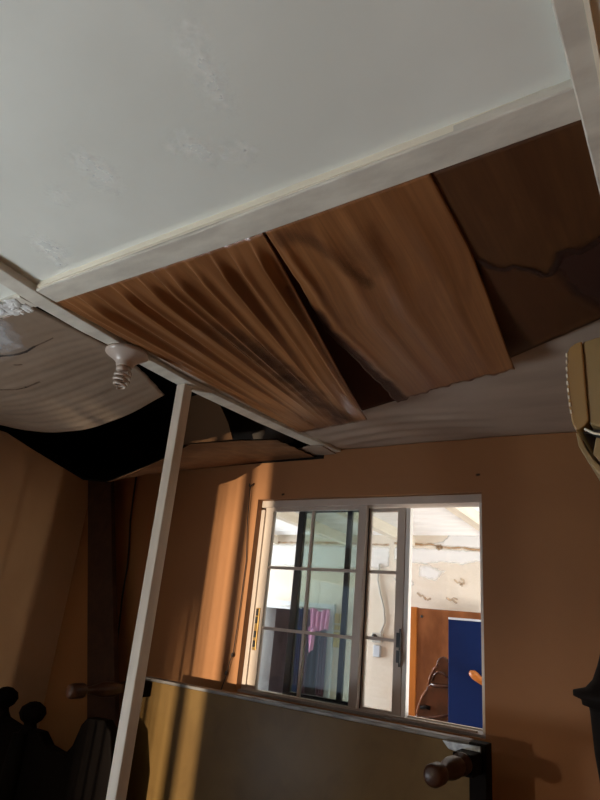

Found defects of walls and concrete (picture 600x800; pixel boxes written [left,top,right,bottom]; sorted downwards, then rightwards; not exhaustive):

peeling [0,298,34,316]
water stain [242,345,352,424]
water stain [314,310,407,402]